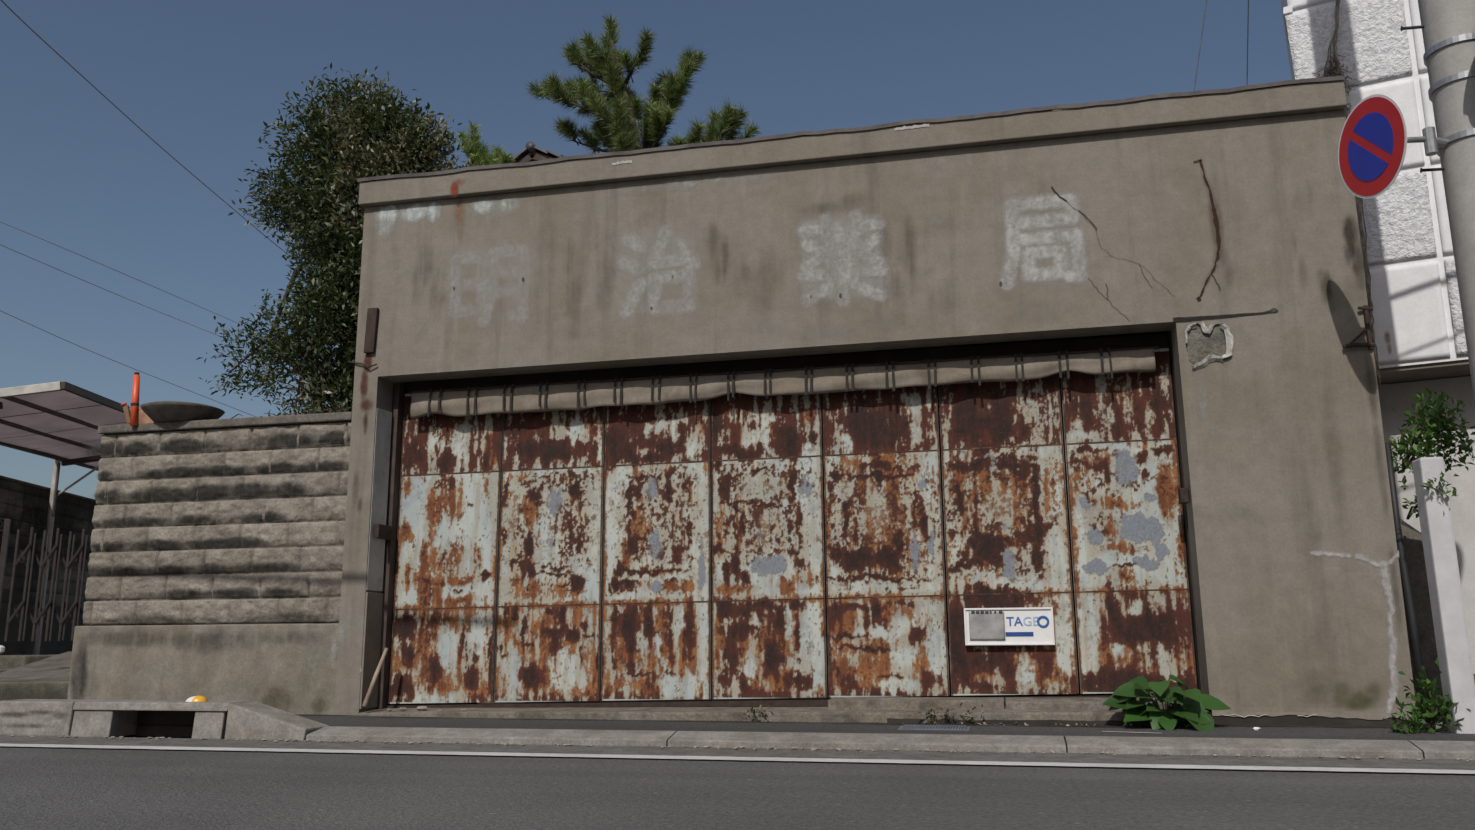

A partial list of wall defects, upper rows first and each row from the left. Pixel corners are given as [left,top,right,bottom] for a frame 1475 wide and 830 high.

crack [1051,186,1097,230]
crack [1173,159,1278,323]
spalling [1185,322,1233,370]
rust [402,351,1176,475]
rust [390,590,1197,703]
crack [1311,551,1399,713]